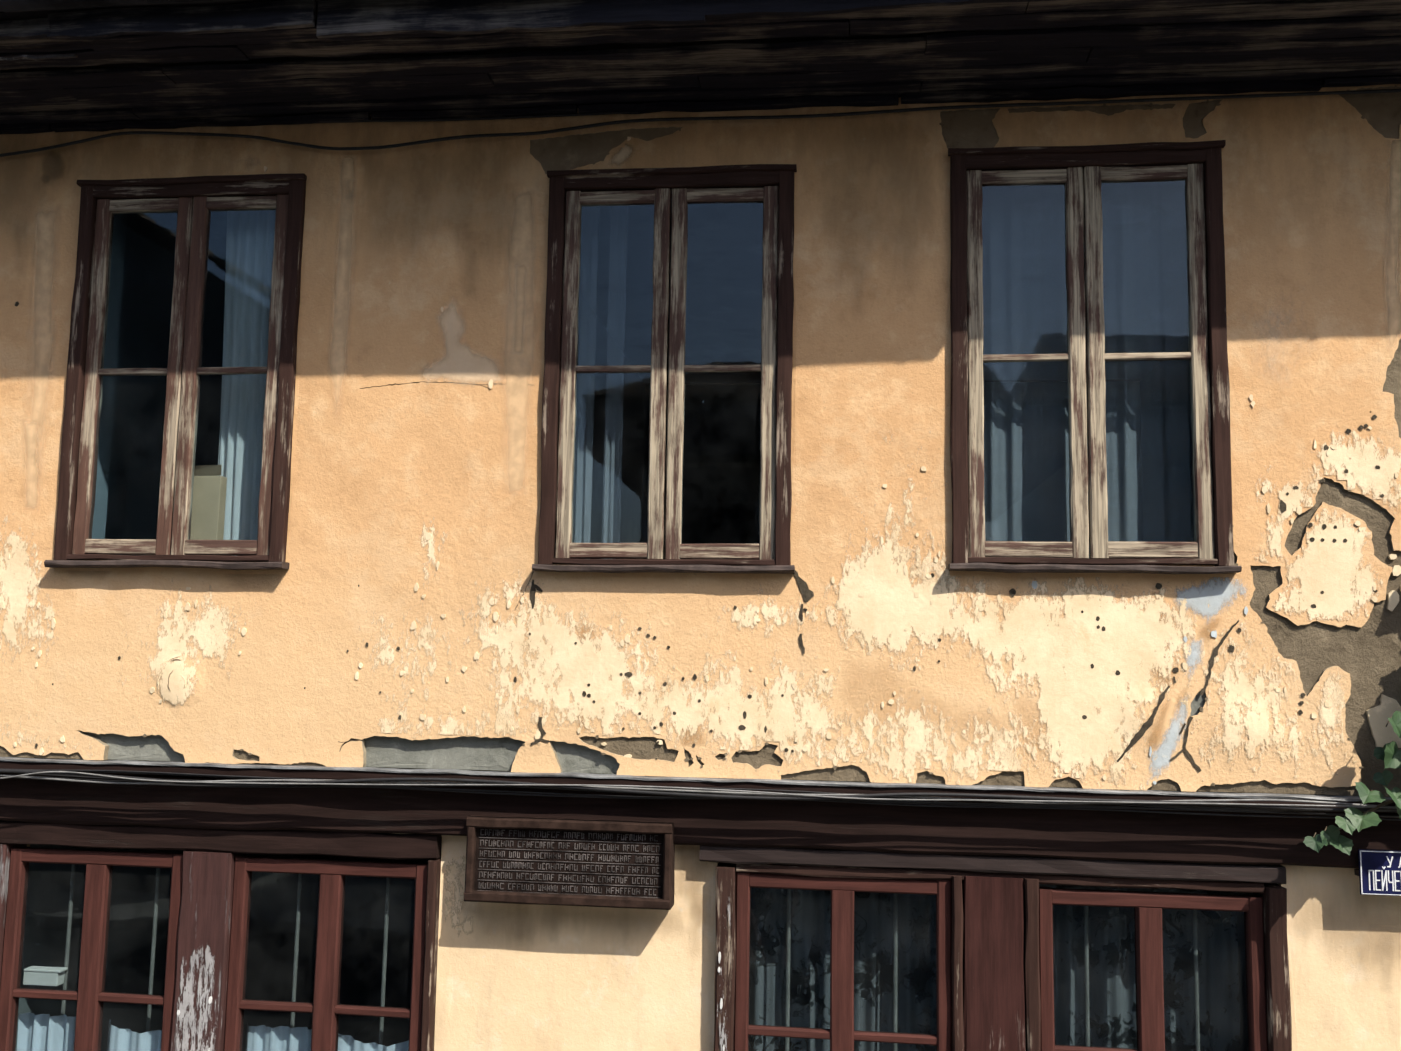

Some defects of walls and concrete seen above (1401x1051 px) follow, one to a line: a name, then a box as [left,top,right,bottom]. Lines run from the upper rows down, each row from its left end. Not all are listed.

flaking render [530,127,681,174]
flaking render [939,99,1222,148]
flaking render [1340,85,1401,139]
peeling [424,305,498,389]
peeling [0,515,57,667]
peeling [118,581,247,705]
crack [793,570,814,654]
peeling [347,339,1401,797]
flaking render [0,714,185,762]
crack [1117,620,1239,772]
peeling [176,945,219,1051]